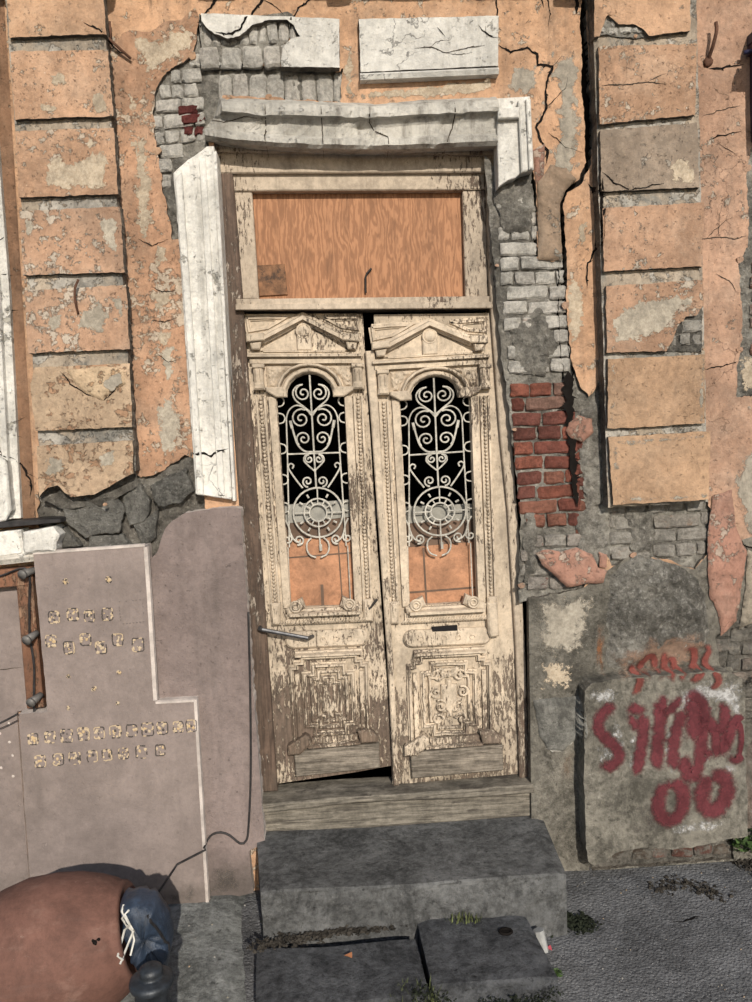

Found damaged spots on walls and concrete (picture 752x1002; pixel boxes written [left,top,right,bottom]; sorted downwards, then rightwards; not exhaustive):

crack [200,0,310,35]
peeling [509,66,537,95]
crack [708,61,744,71]
flaking render [129,12,494,267]
crack [703,106,740,156]
crack [703,203,745,240]
crack [420,0,664,508]
peeling [158,331,175,380]
flaking render [484,144,752,718]
flaking render [38,398,205,557]
flaking render [589,839,732,868]